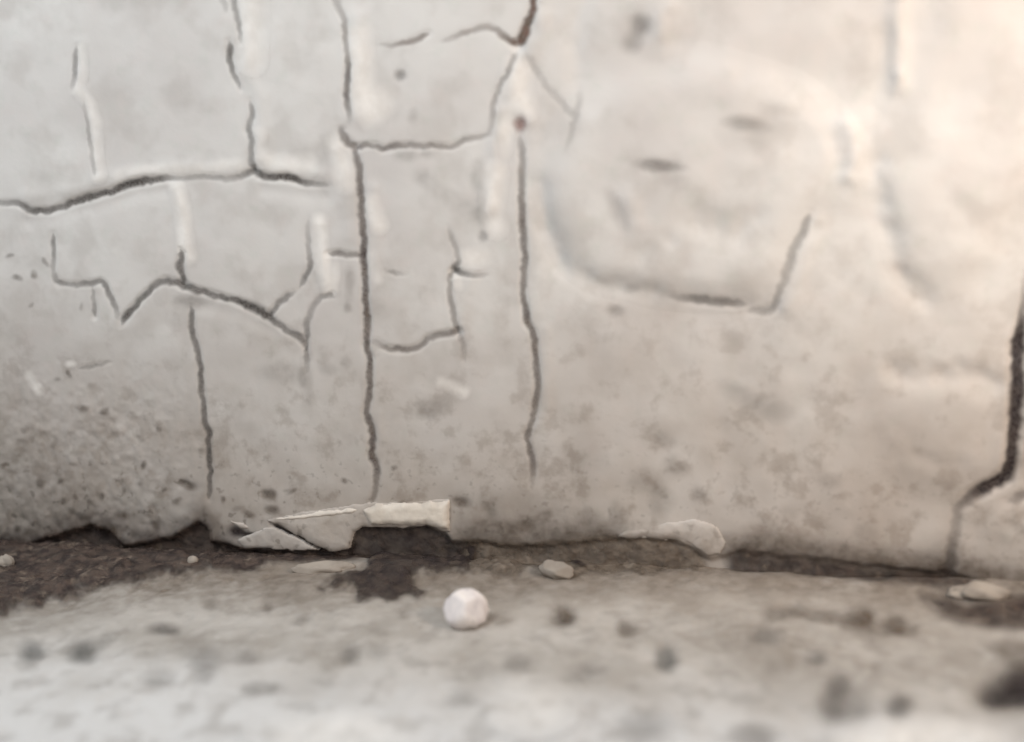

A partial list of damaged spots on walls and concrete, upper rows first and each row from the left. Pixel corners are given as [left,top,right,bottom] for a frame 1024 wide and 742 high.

crack [506,0,536,45]
crack [343,63,351,98]
crack [24,177,161,213]
crack [251,169,302,184]
crack [519,209,527,259]
crack [346,139,379,473]
crack [524,303,538,384]
crack [122,253,275,485]
crack [971,317,1024,495]
peeling [231,499,450,552]
peeling [618,519,726,556]